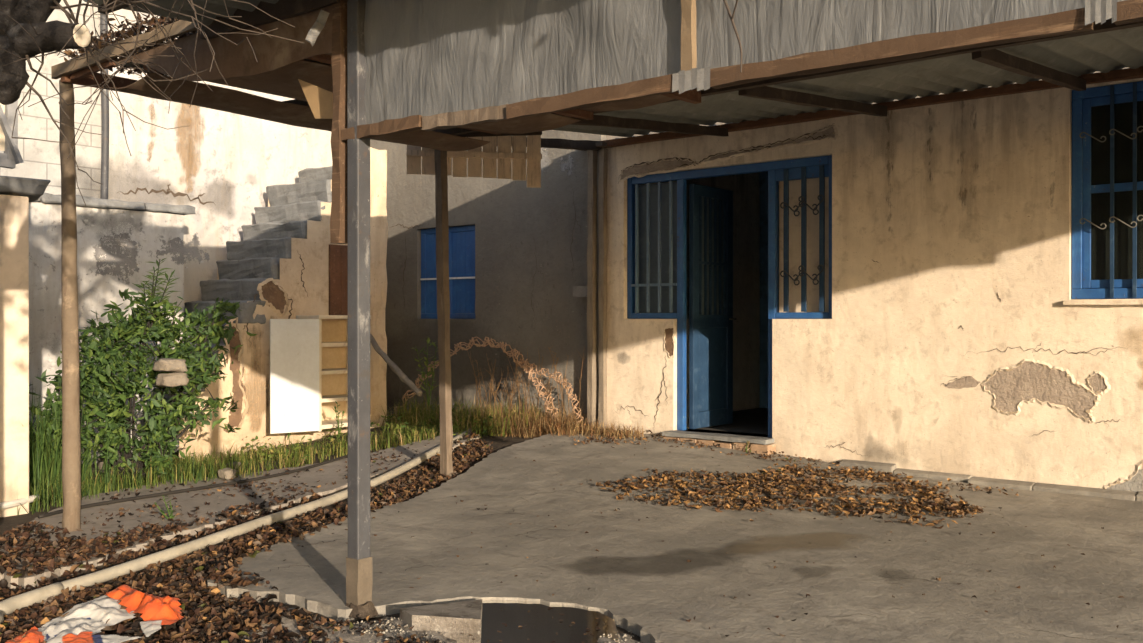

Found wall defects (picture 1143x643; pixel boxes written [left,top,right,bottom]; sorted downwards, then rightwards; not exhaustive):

crack [621,123,834,171]
crack [117,184,215,205]
peeling [84,220,210,284]
flaking render [257,278,290,317]
crack [943,325,1126,386]
flaking render [945,359,1111,424]
flaking render [1104,460,1143,492]